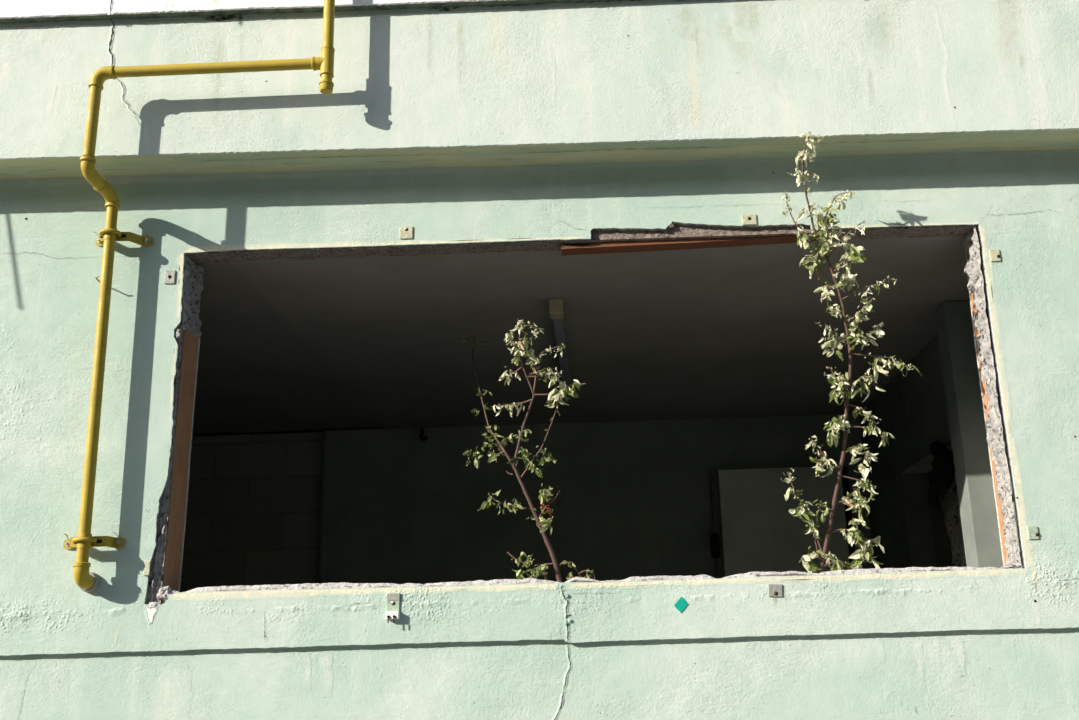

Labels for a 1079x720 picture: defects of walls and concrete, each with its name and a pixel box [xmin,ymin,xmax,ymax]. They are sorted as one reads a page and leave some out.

crack [107,0,143,128]
spalling [144,223,1024,625]
crack [552,585,603,720]